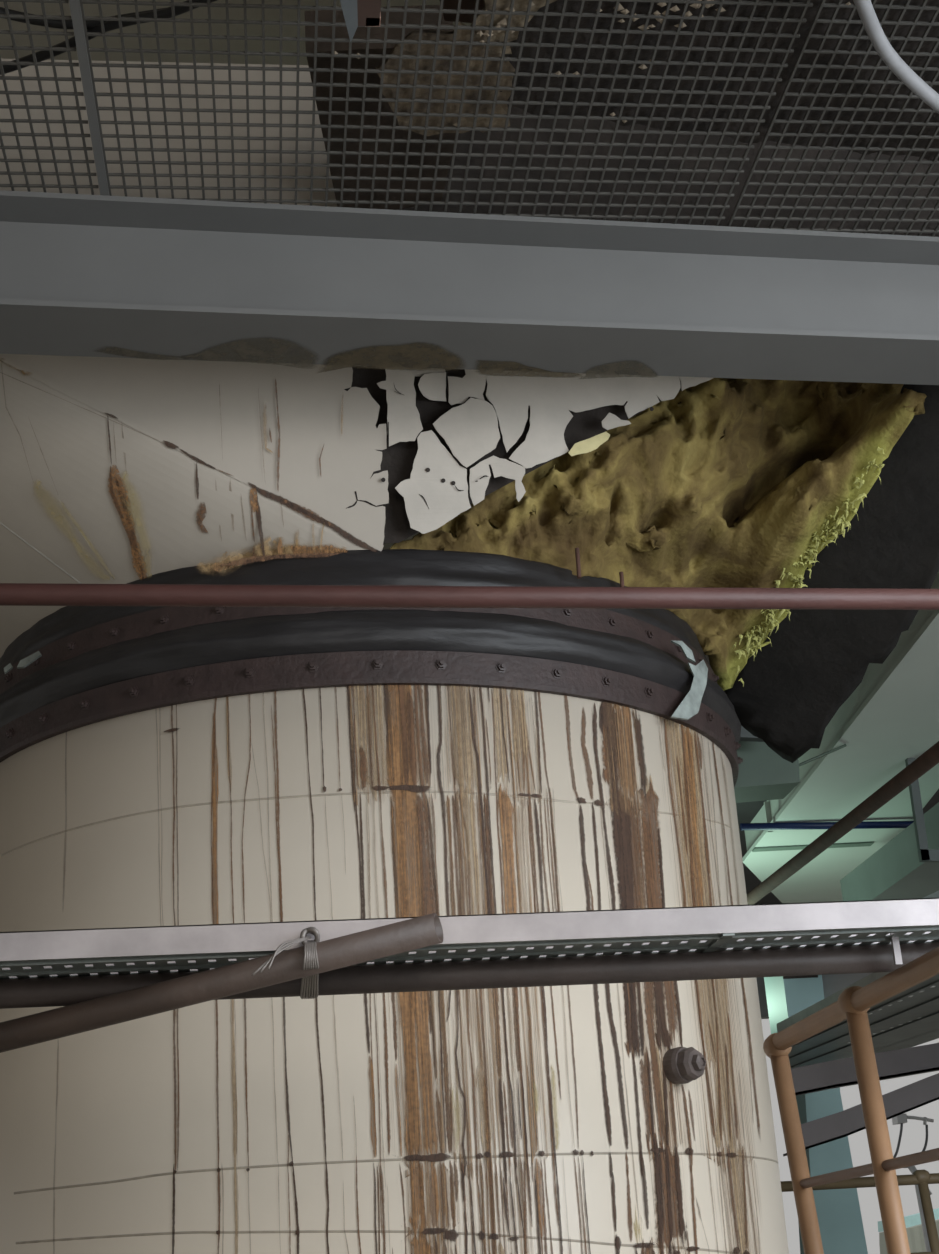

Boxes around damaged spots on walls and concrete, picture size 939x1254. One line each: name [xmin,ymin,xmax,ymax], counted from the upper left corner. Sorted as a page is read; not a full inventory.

rust [105,413,152,579]
rust [198,379,377,572]
crack [347,491,385,508]
peeling [377,369,713,534]
rust [303,685,560,920]
rust [564,695,733,911]
rust [316,998,329,1254]
rust [356,985,594,1254]
rust [594,978,761,1254]